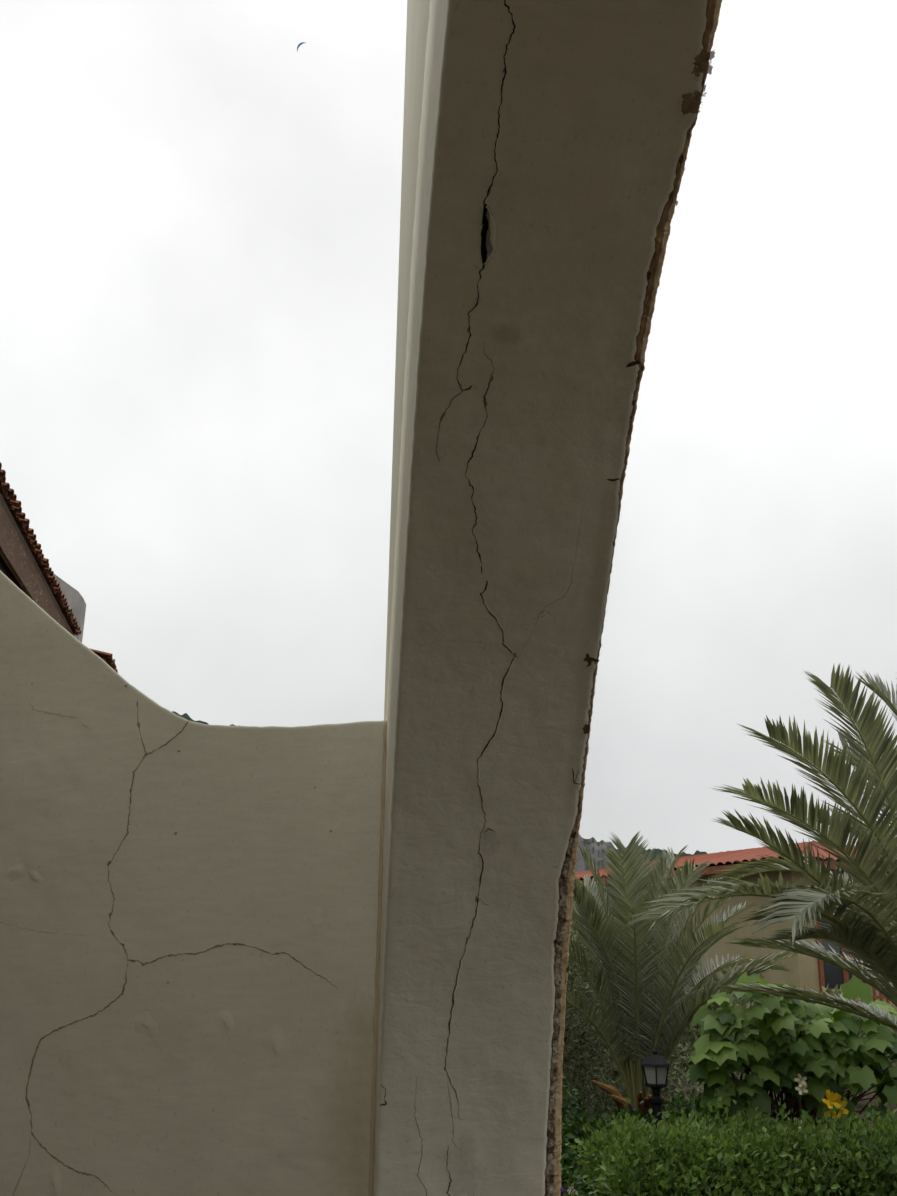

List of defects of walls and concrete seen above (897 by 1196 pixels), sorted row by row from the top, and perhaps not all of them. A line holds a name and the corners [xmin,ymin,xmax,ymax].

crack [25,698,338,1196]
crack [414,0,581,1196]
spalling [545,0,722,1196]